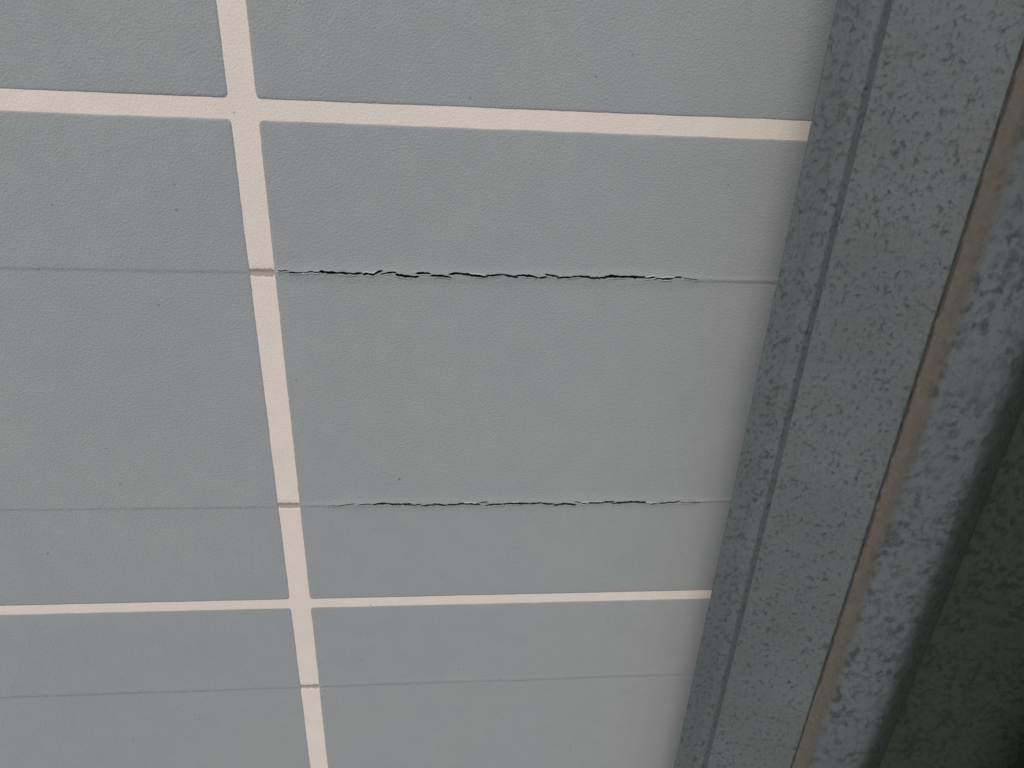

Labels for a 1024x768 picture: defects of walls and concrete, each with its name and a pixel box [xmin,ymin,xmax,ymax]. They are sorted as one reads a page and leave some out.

crack [277,270,699,282]
crack [333,500,699,508]